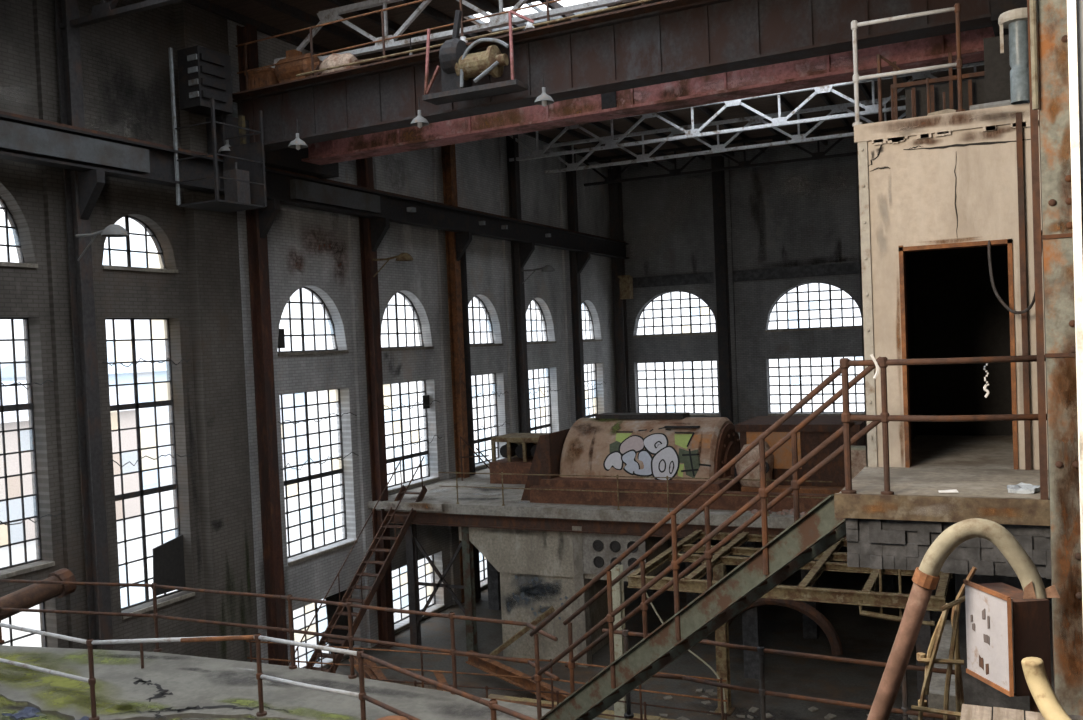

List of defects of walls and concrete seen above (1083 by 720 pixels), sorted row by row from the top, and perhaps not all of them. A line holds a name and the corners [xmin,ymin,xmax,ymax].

crack [868,139,1031,240]
rust [1051,132,1073,233]
rust [1054,349,1083,689]
leakage [302,680,417,696]